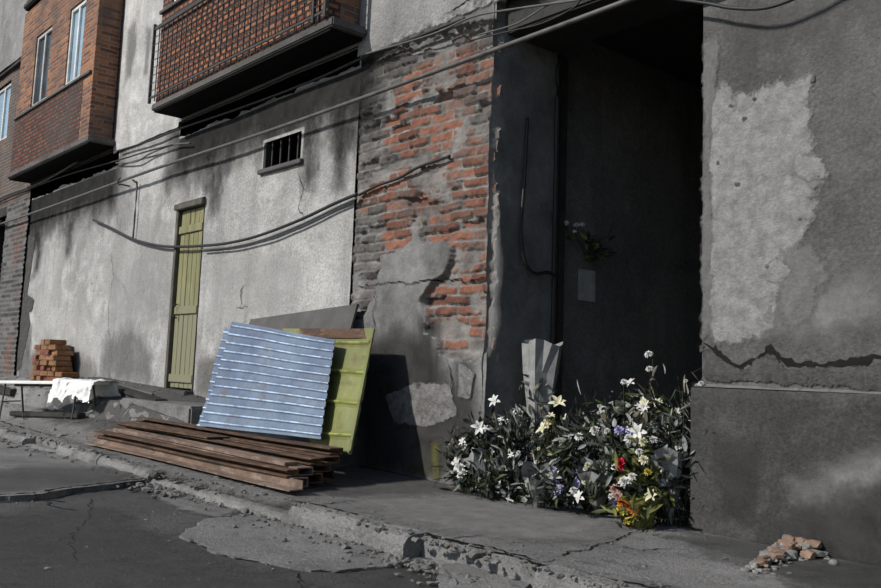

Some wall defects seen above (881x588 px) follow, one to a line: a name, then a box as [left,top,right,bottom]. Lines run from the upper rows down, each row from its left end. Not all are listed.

spalling [381,0,498,47]
peeling [699,40,881,392]
crack [703,342,881,371]
crack [292,500,358,515]
crack [426,503,673,566]
crack [586,573,672,588]